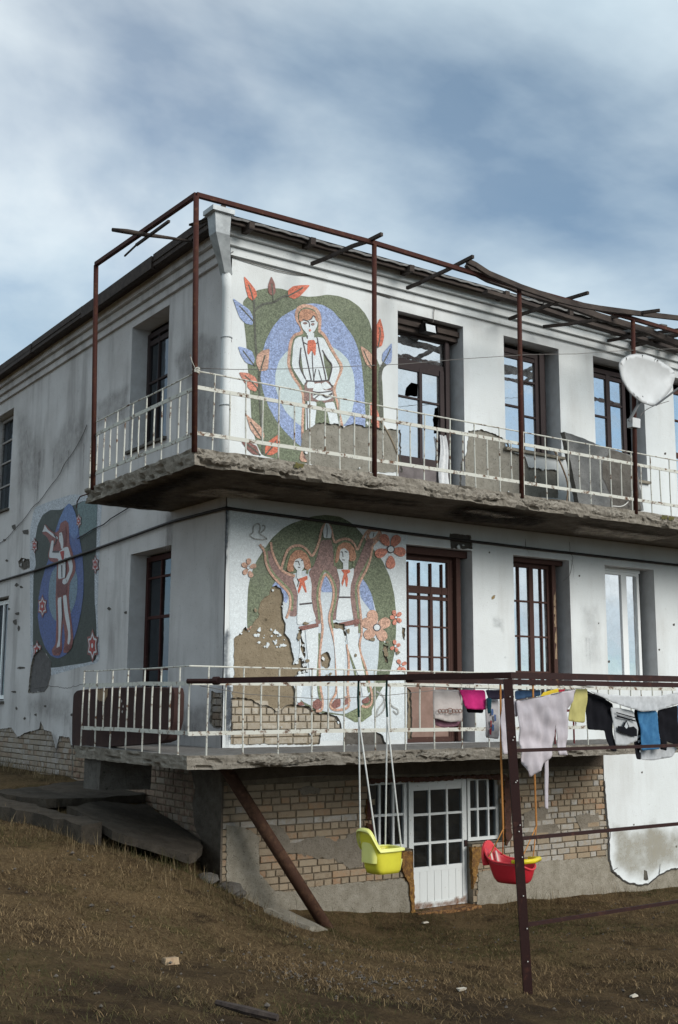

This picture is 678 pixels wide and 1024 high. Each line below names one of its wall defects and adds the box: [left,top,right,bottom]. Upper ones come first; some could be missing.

flaking render [424,429,572,518]
peeling [577,508,661,541]
flaking render [11,649,52,693]
flaking render [209,585,473,765]
flaking render [0,705,74,779]